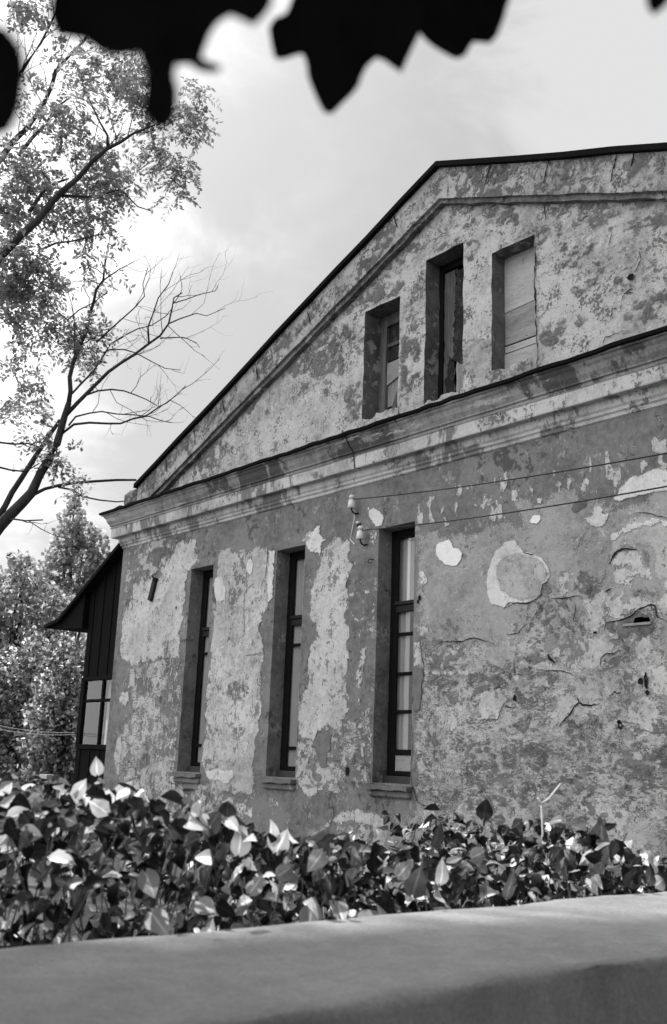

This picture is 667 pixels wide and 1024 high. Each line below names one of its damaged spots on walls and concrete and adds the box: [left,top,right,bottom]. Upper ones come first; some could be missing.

peeling [543,456,597,493]
peeling [605,436,667,501]
peeling [368,507,384,545]
peeling [414,472,541,566]
peeling [119,524,259,821]
peeling [201,550,275,783]
peeling [296,525,375,798]
crack [513,654,621,727]
peeling [486,506,667,739]
crack [600,604,667,665]
peeling [324,809,386,851]